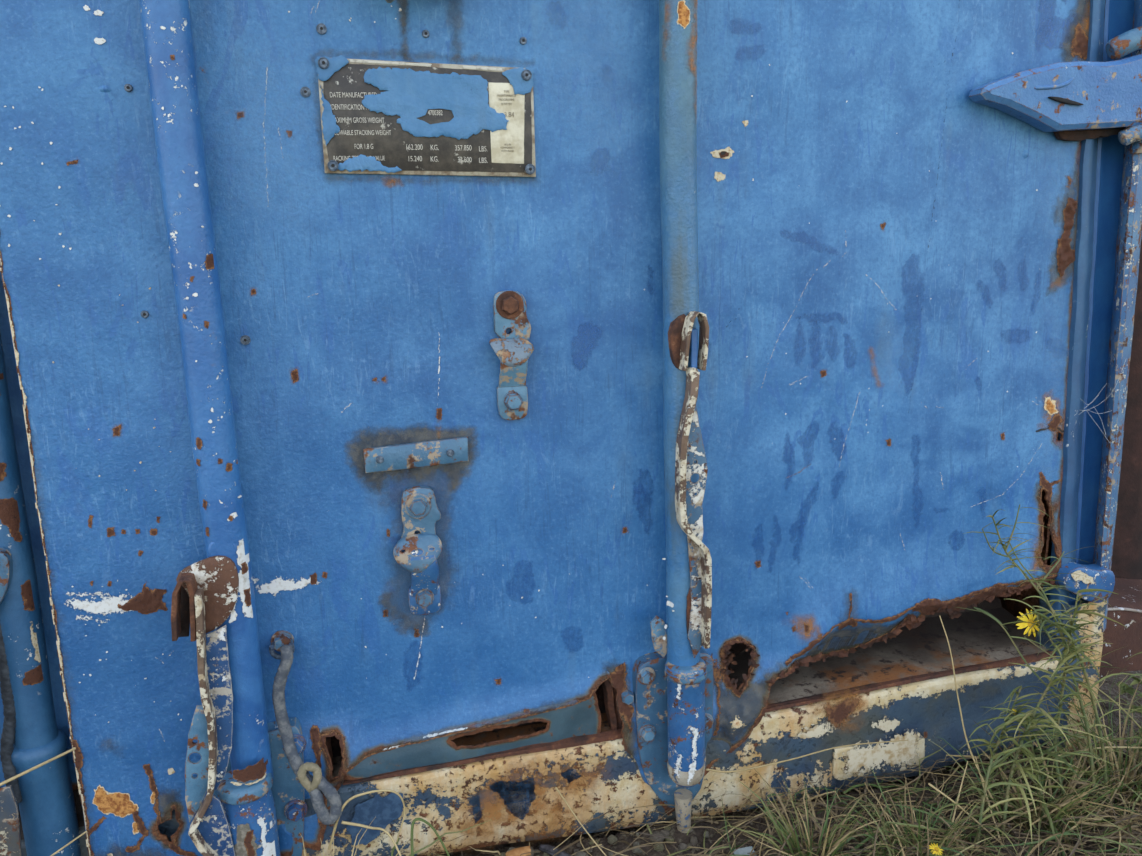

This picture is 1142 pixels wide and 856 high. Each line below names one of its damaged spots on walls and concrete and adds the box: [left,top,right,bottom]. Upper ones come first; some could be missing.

peeling [315,55,349,146]
peeling [362,67,509,140]
peeling [338,154,402,173]
corrosion [1050,176,1078,311]
corrosion [1039,471,1062,500]
corrosion [0,251,139,856]
corrosion [117,583,168,614]
corrosion [710,551,1060,736]
peeling [674,727,699,785]
peeling [793,721,839,739]
peeling [871,716,903,732]
peeling [346,792,403,846]